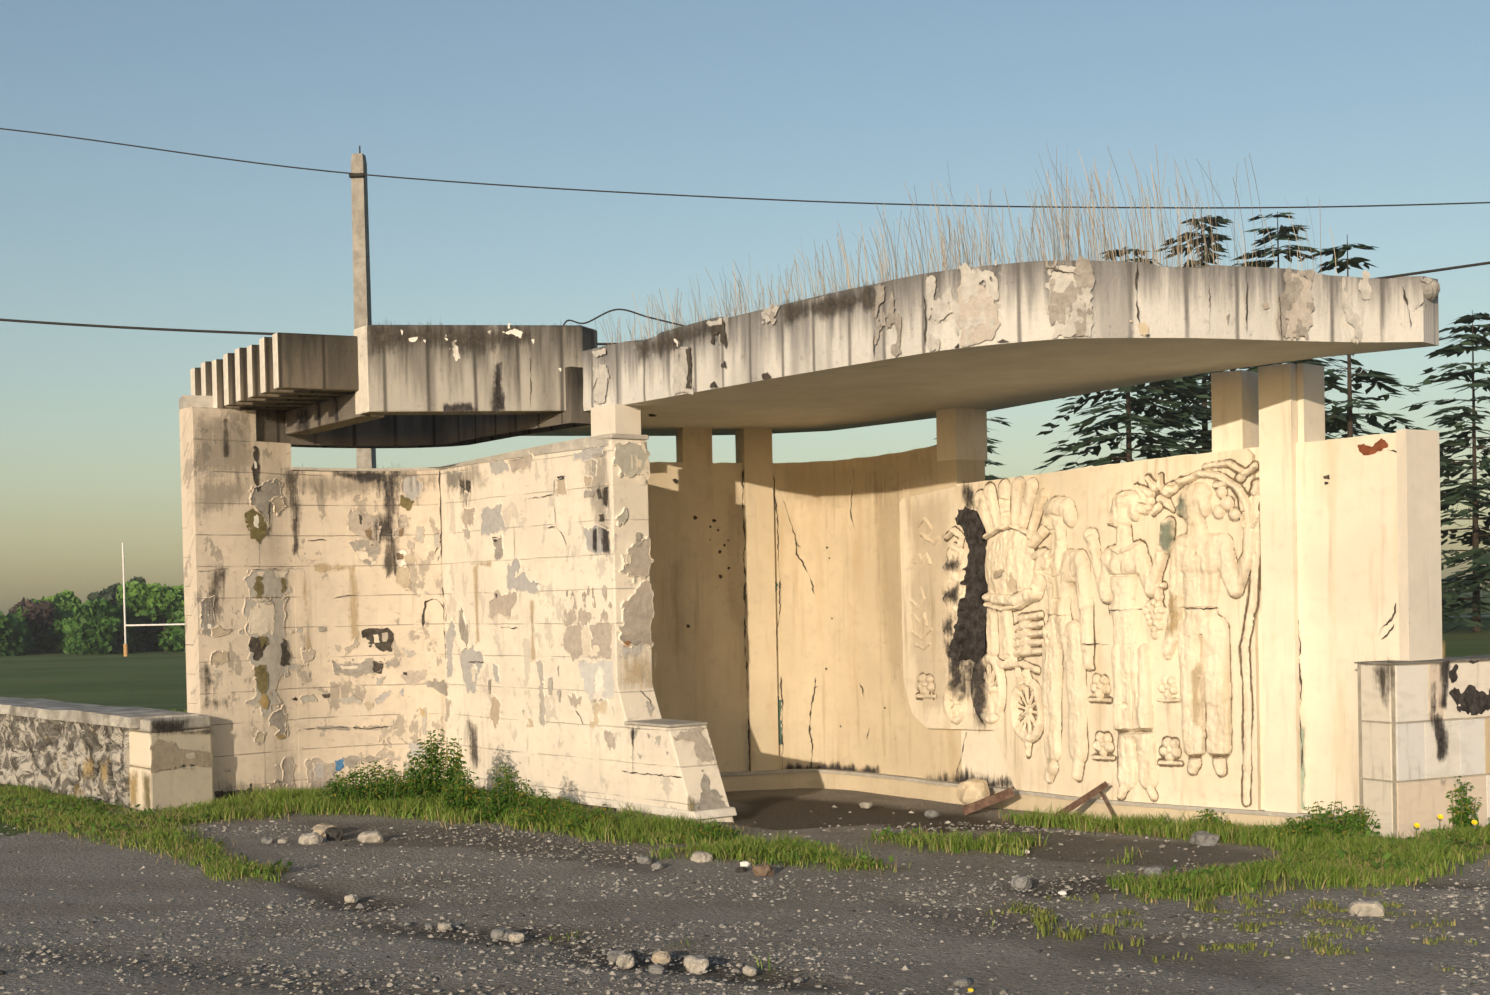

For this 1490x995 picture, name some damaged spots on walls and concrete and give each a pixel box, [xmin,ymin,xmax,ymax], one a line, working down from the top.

spalling [923,259,1009,351]
spalling [1044,256,1095,339]
leakage [368,323,534,414]
leakage [286,471,300,554]
leakage [337,471,400,575]
peeling [345,475,441,595]
peeling [445,468,541,621]
spalling [196,568,503,800]
peeling [522,524,654,752]
crack [741,468,818,771]
leakage [942,485,988,725]
leakage [1431,645,1490,760]